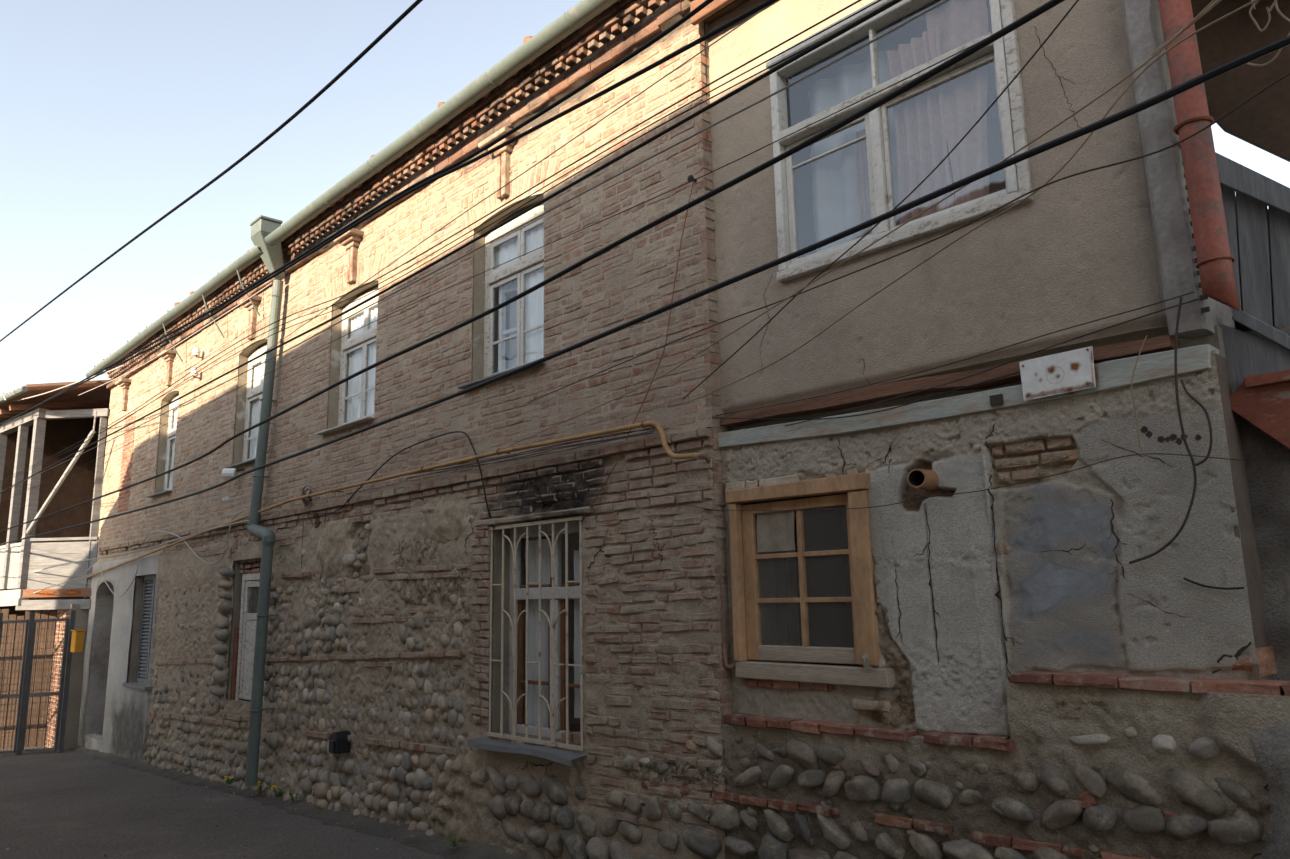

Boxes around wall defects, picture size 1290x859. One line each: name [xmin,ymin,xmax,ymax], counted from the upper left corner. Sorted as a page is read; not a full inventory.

crack [1033,25,1081,128]
corrosion [1027,353,1097,398]
spalling [902,462,955,511]
spalling [987,437,1079,490]
crack [895,510,940,666]